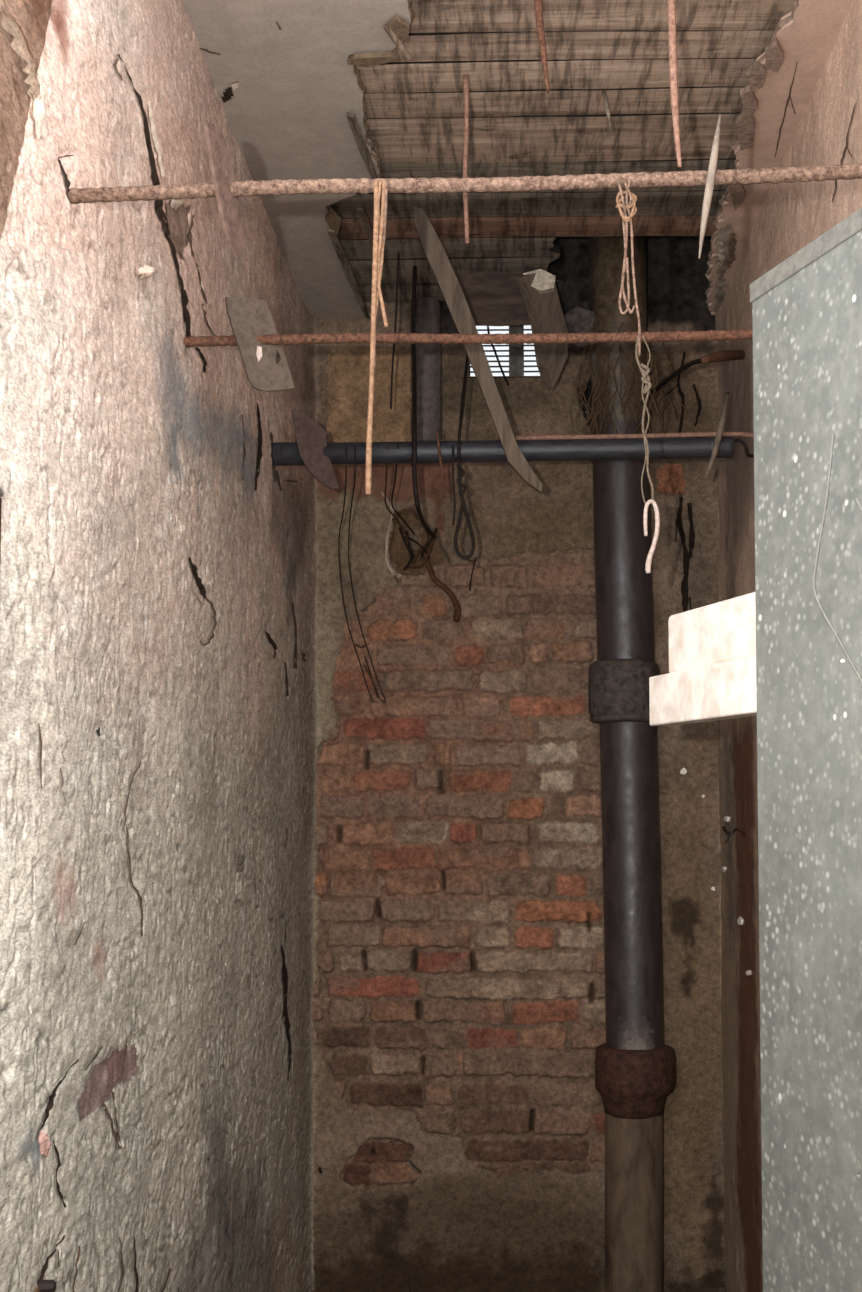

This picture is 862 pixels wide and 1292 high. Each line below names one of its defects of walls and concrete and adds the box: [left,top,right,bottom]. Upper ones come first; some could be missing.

spalling [66,0,862,313]
crack [114,54,216,372]
spalling [183,335,237,347]
spalling [255,329,753,345]
crack [189,557,217,645]
flaking render [312,492,606,1178]
crack [281,921,291,1080]
crack [37,1046,103,1292]
spalling [78,1044,139,1120]
crack [103,1092,122,1149]
flaking render [341,1138,420,1188]
crack [118,1237,179,1292]